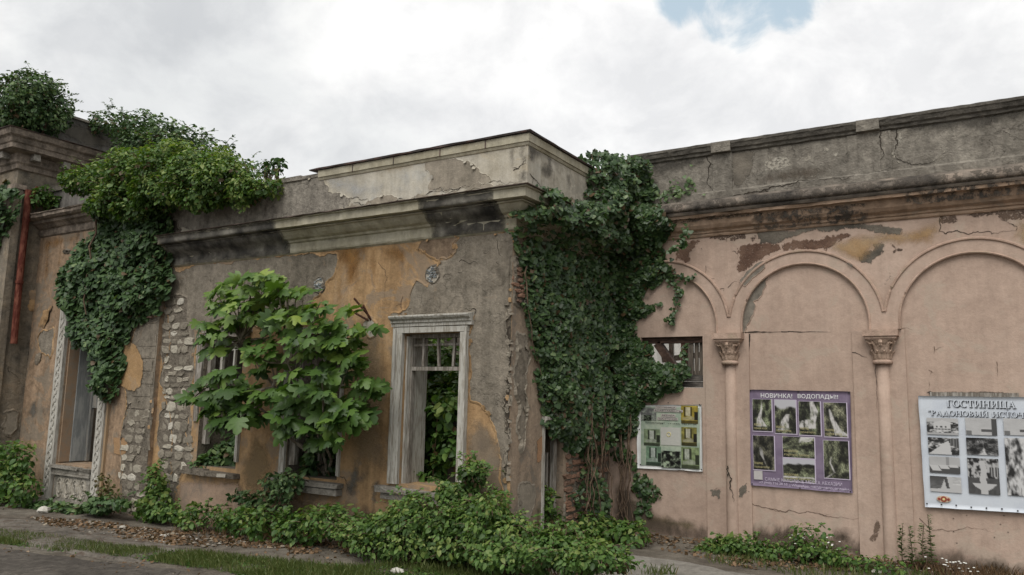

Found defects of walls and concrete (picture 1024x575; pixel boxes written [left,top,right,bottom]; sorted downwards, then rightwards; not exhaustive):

flaking render [166,157,522,234]
leakage [419,189,505,238]
crack [706,153,854,196]
crack [879,129,944,166]
peeling [676,223,903,333]
flaking render [113,252,339,522]
flaking render [389,231,542,508]